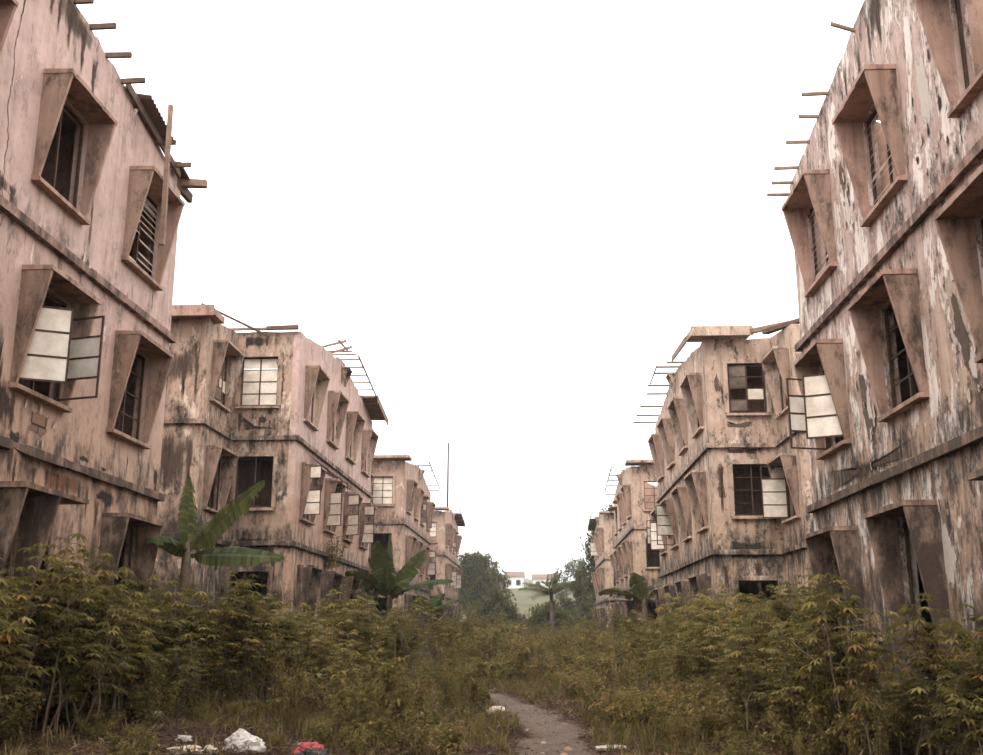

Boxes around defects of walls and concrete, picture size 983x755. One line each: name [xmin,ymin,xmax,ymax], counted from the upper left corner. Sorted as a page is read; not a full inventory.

crack [0,0,26,226]
water stain [0,335,20,481]
water stain [165,343,200,398]